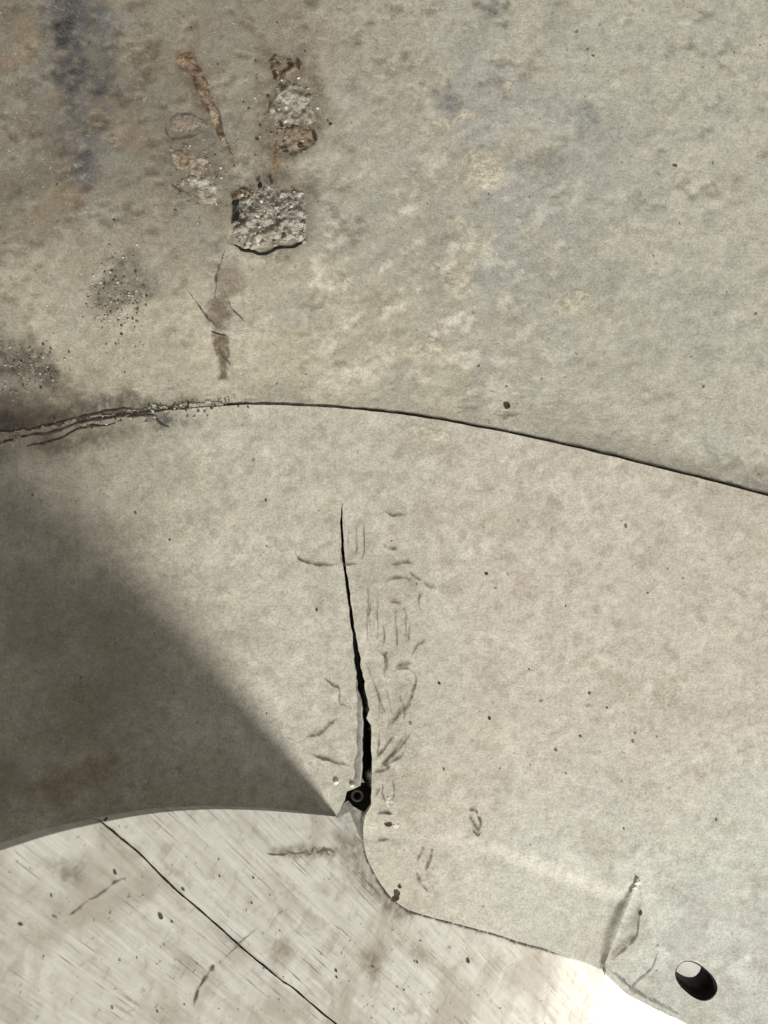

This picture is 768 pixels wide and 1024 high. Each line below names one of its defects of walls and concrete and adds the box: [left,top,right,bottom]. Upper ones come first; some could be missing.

corrosion [174,51,234,158]
spalling [243,50,352,184]
water stain [210,276,241,379]
crack [0,394,768,496]
crack [298,503,372,786]
crack [102,817,337,1024]